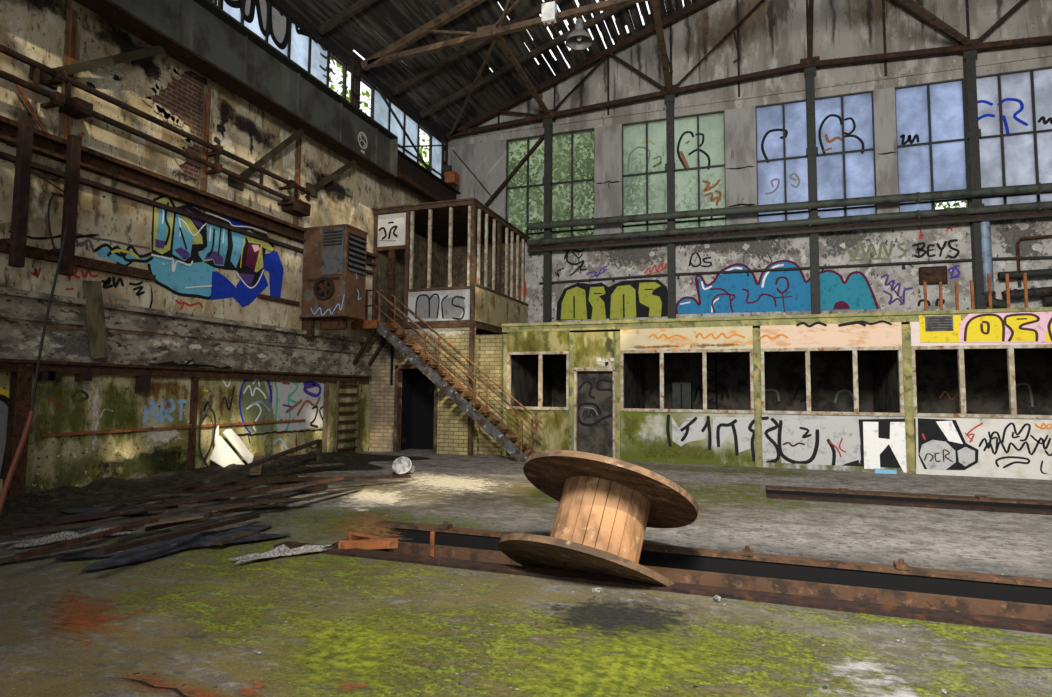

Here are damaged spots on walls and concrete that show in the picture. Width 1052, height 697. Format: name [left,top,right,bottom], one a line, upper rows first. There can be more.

damp [686,0,789,61]
damp [848,0,900,41]
flaking render [86,57,310,201]
damp [31,385,196,480]